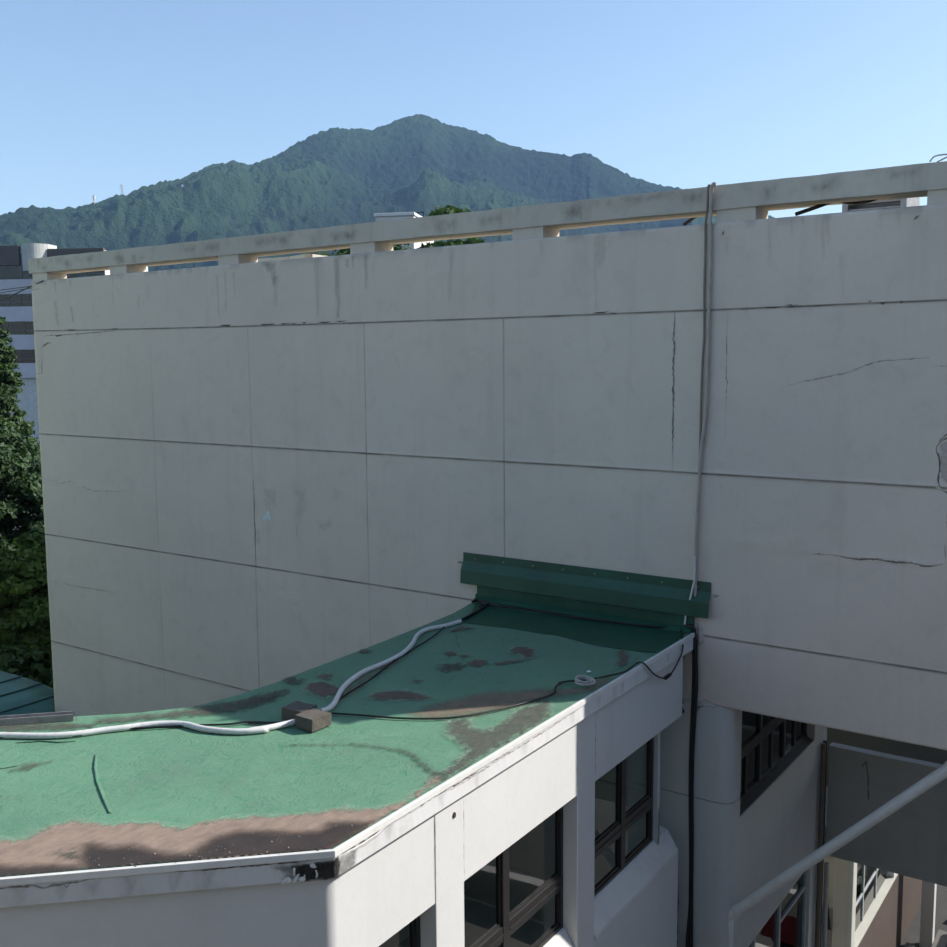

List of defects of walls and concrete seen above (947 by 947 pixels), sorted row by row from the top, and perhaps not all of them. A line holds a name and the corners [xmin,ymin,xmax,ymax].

crack [669,322,677,441]
crack [818,553,940,567]
peeling [0,700,554,876]
spalling [277,848,356,885]